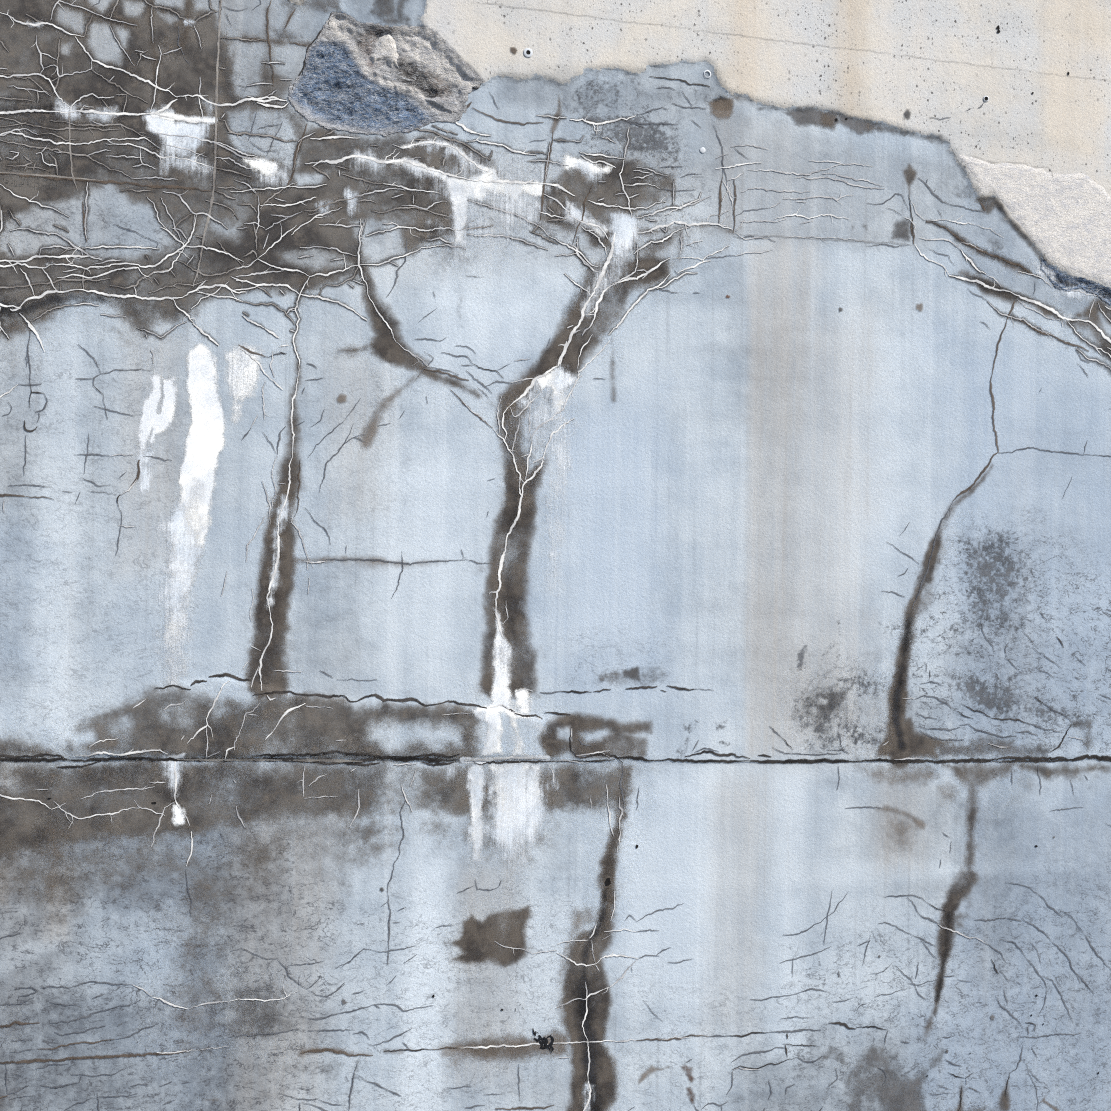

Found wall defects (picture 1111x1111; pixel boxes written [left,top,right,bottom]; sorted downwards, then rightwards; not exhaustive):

spalling [287,12,485,136]
damp [904,165,916,186]
spalling [959,154,1111,305]
crack [0,0,1111,852]
damp [0,0,679,1111]
damp [878,467,992,779]
crack [335,785,416,969]
crack [0,891,822,1111]
crack [831,1022,888,1044]
crack [750,891,970,1011]
crack [886,895,1093,1111]
damp [926,764,1105,1033]